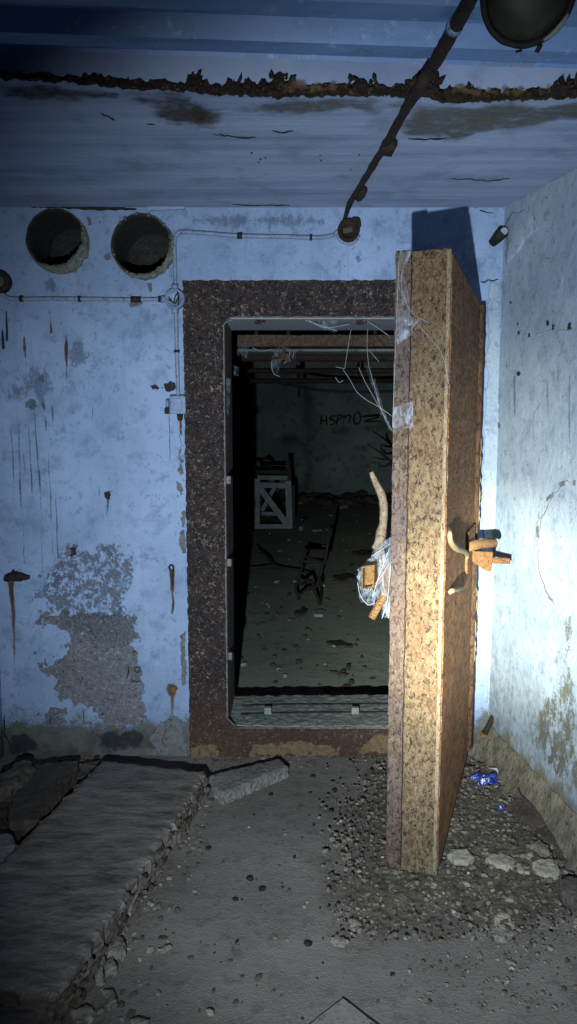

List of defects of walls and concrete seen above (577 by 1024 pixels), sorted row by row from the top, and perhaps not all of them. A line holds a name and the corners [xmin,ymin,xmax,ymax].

rust [0,70,577,104]
water stain [137,94,217,125]
water stain [405,104,577,139]
peeling [176,449,184,495]
spalling [30,540,188,756]
water stain [101,731,143,751]